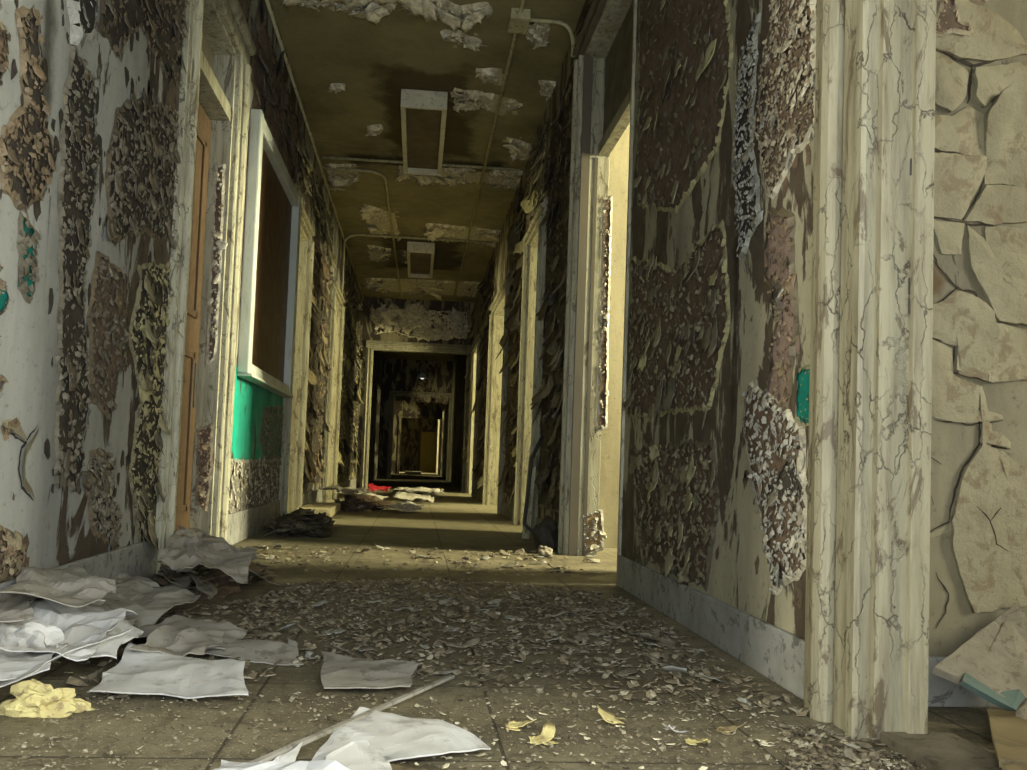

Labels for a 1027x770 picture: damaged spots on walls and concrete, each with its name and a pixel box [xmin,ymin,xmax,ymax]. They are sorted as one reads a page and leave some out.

crack [940,52,997,104]
peeling [0,0,191,565]
peeling [207,163,228,364]
peeling [238,0,575,518]
peeling [596,195,613,431]
peeling [621,0,817,610]
crack [933,253,978,304]
crack [934,179,991,226]
peeling [0,525,30,582]
peeling [228,403,285,518]
crack [936,573,949,628]
crack [930,337,1011,551]